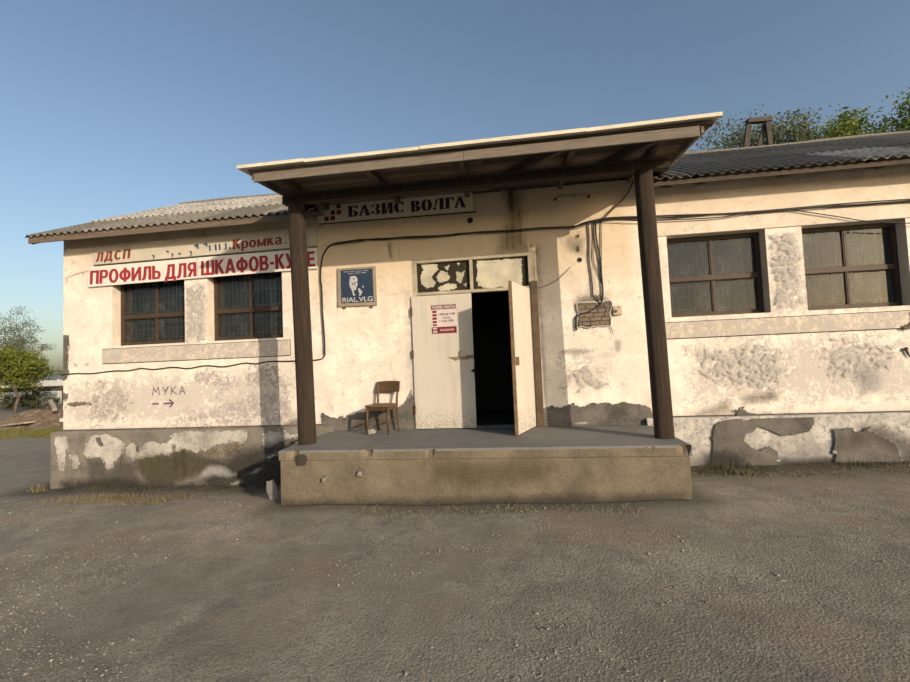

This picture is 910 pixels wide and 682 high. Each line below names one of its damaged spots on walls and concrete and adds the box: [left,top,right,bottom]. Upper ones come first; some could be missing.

peeling [566,362,609,393]
peeling [54,364,298,471]
flaking render [321,389,416,431]
flaking render [544,401,653,427]
flaking render [711,407,818,465]
flaking render [833,426,902,463]